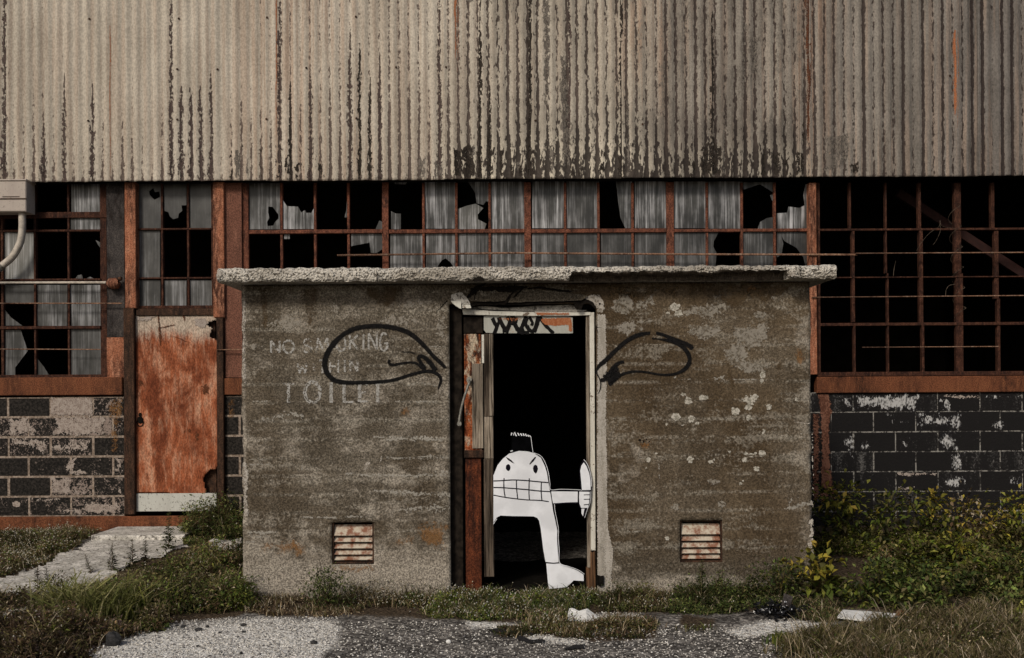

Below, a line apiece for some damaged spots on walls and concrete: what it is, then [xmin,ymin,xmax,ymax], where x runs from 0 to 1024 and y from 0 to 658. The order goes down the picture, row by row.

rust [804,0,813,153]
peeling [8,397,123,514]
peeling [451,268,787,592]